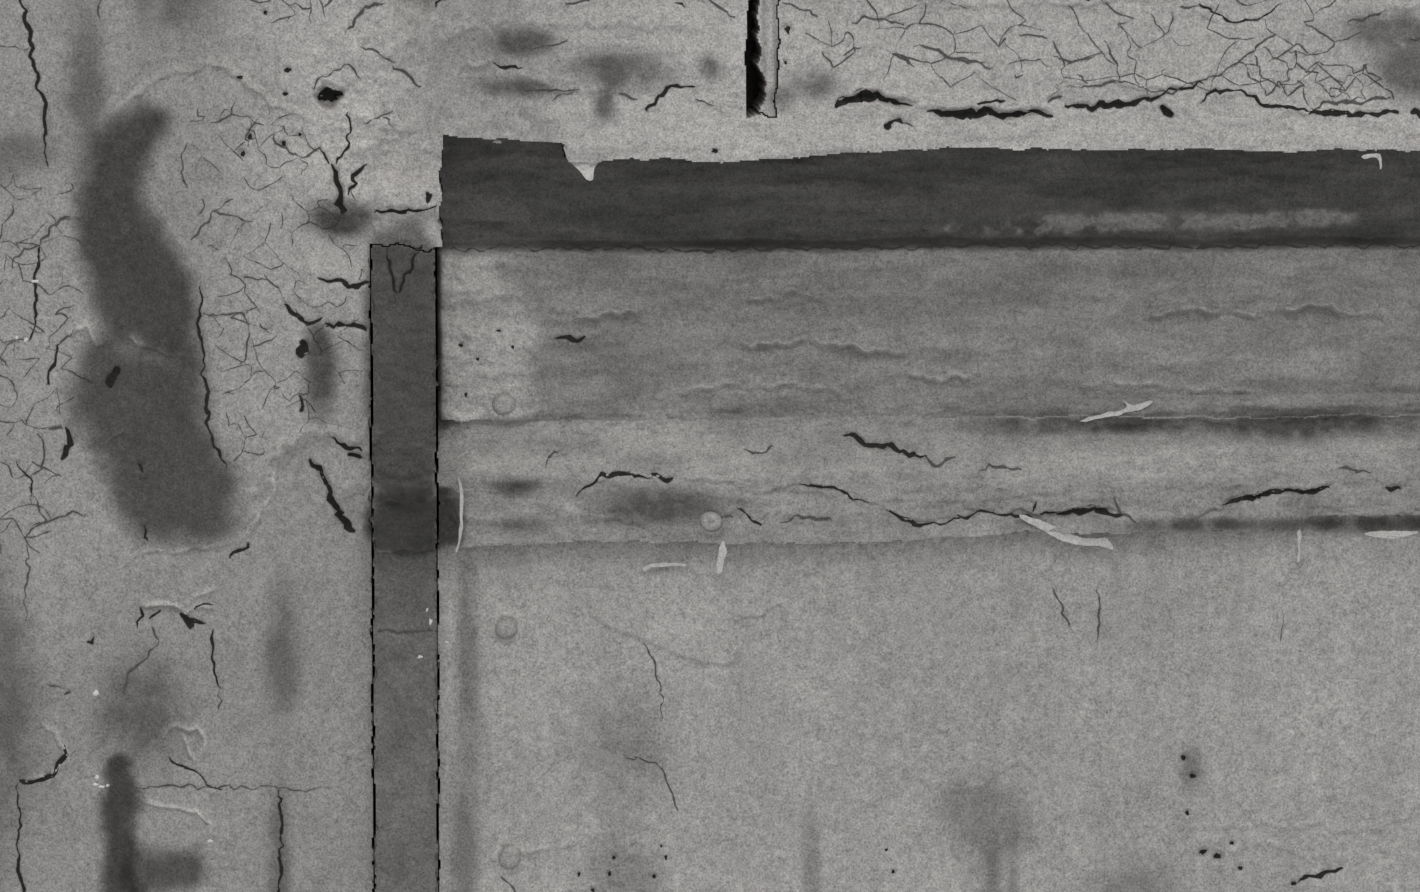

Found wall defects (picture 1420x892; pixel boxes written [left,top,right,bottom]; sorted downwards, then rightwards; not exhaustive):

crack [0,0,48,166]
crack [843,4,1420,118]
peeling [564,145,599,181]
crack [180,102,1420,358]
water stain [79,111,230,533]
peeling [1081,400,1153,422]
crack [309,437,362,533]
peeling [456,477,464,553]
peeling [537,436,1125,549]
crack [721,484,1136,527]
peeling [1171,461,1420,539]
crack [1222,466,1401,505]